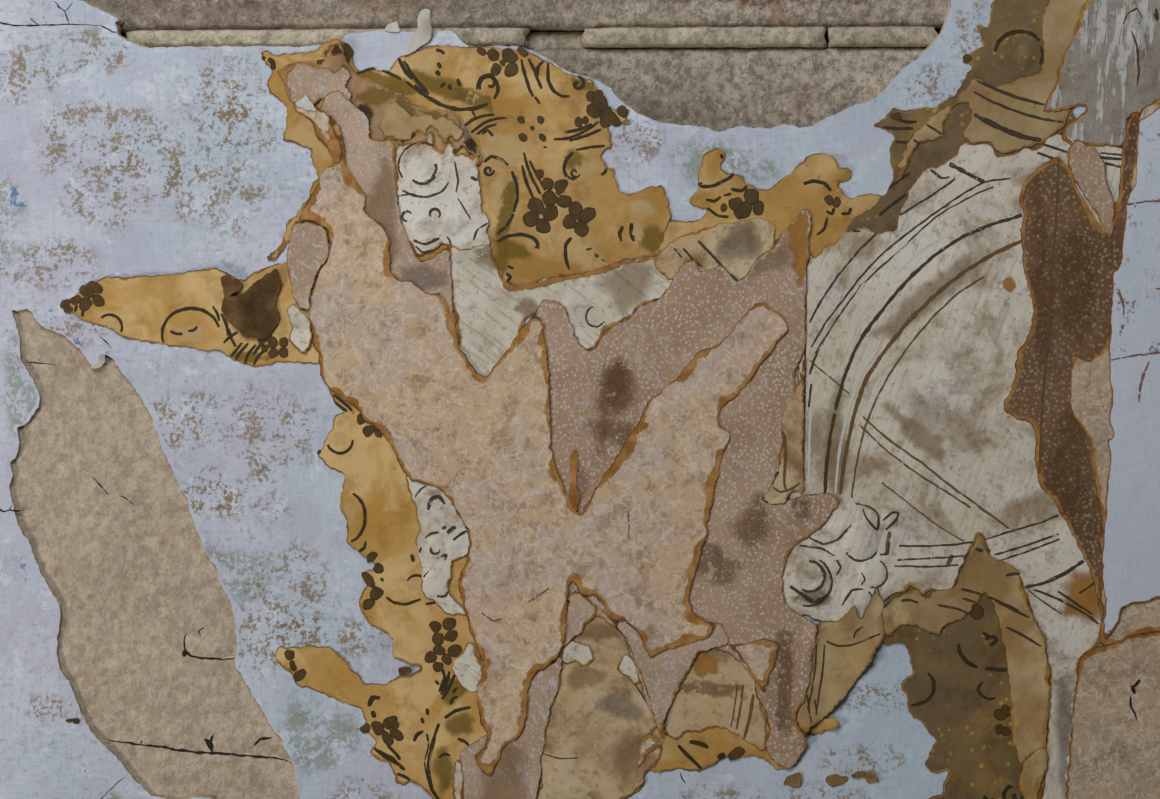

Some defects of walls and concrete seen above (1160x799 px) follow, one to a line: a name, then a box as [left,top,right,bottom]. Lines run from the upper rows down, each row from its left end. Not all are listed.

crack [0,2,116,33]
peeling [385,9,432,56]
spalling [11,310,300,799]
peeling [796,586,885,736]
crack [107,735,292,764]